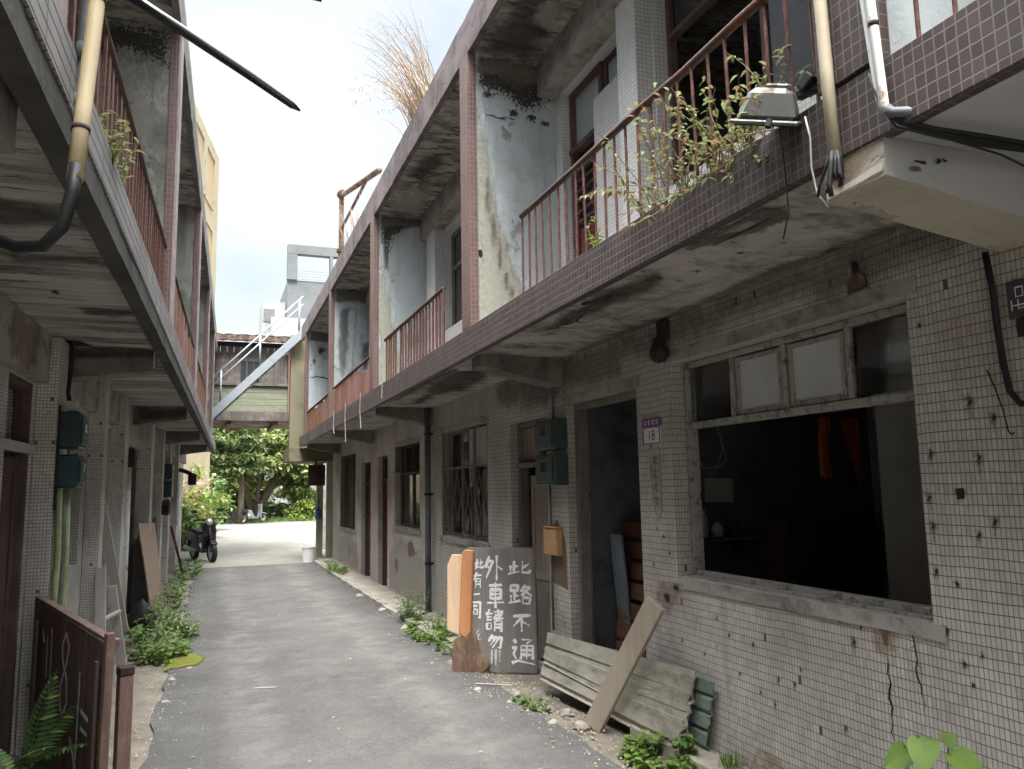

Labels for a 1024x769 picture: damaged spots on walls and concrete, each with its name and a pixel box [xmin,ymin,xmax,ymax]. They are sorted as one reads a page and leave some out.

mould [101,21,171,70]
water stain [477,0,554,320]
water stain [0,201,58,225]
water stain [310,217,420,384]
water stain [577,223,908,352]
crack [885,653,895,741]
crack [912,636,925,712]